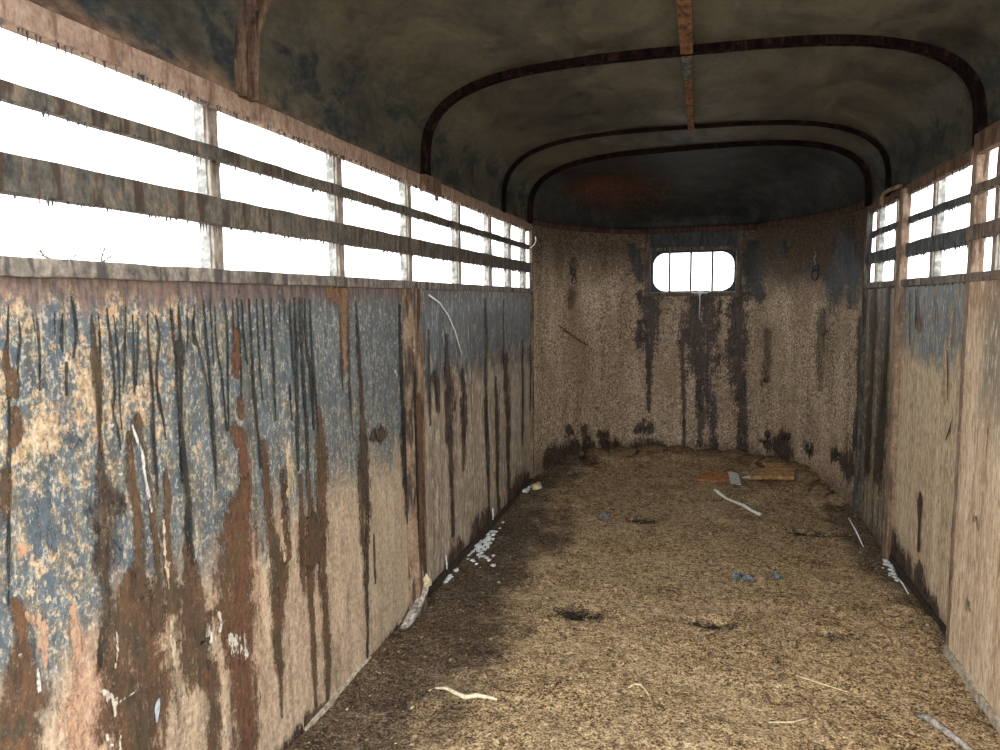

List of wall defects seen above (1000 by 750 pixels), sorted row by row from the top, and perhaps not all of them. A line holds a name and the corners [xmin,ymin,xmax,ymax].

corrosion [1,348,25,448]
water stain [541,285,814,472]
corrosion [0,468,13,521]
peeling [131,425,153,513]
peeling [284,439,295,507]
corrosion [414,392,426,564]
peeling [162,519,171,589]
corrosion [91,396,332,750]
corrosion [0,596,68,750]
peeling [25,610,49,693]
peeling [64,604,139,750]
peeling [206,610,249,660]